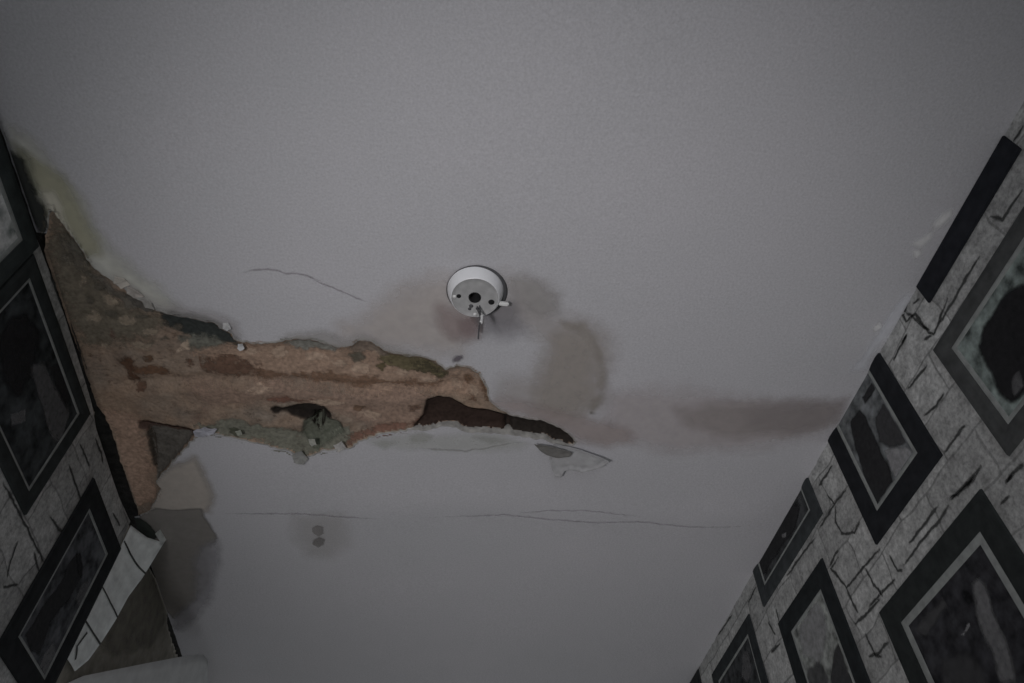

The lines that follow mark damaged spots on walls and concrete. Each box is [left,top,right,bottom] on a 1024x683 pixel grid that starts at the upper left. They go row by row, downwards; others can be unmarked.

spalling [42,210,610,515]